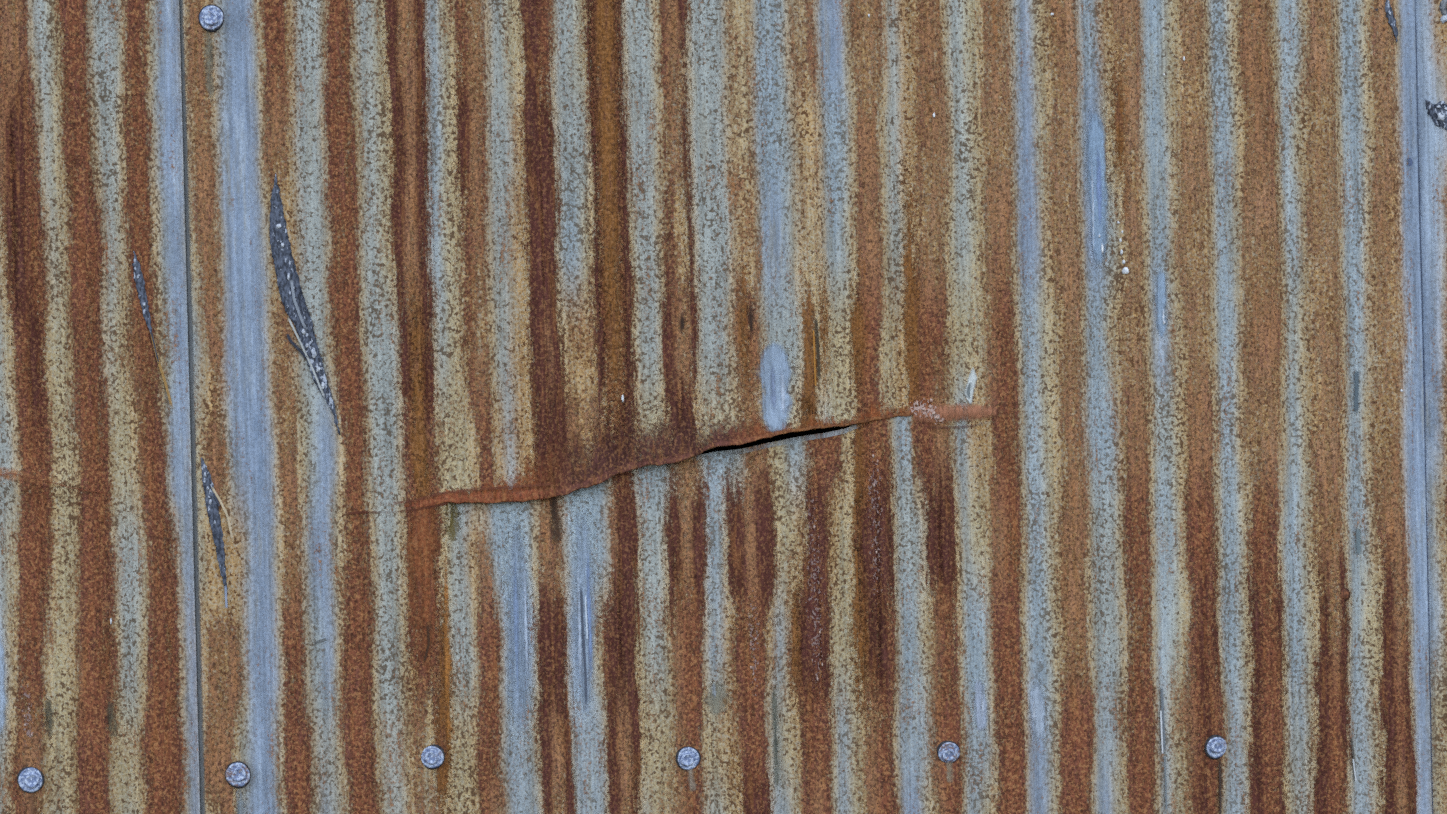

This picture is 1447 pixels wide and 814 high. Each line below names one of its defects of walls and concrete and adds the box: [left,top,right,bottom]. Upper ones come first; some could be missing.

corrosion [0,0,260,814]
corrosion [249,0,307,207]
corrosion [263,0,1294,814]
corrosion [1285,0,1438,814]